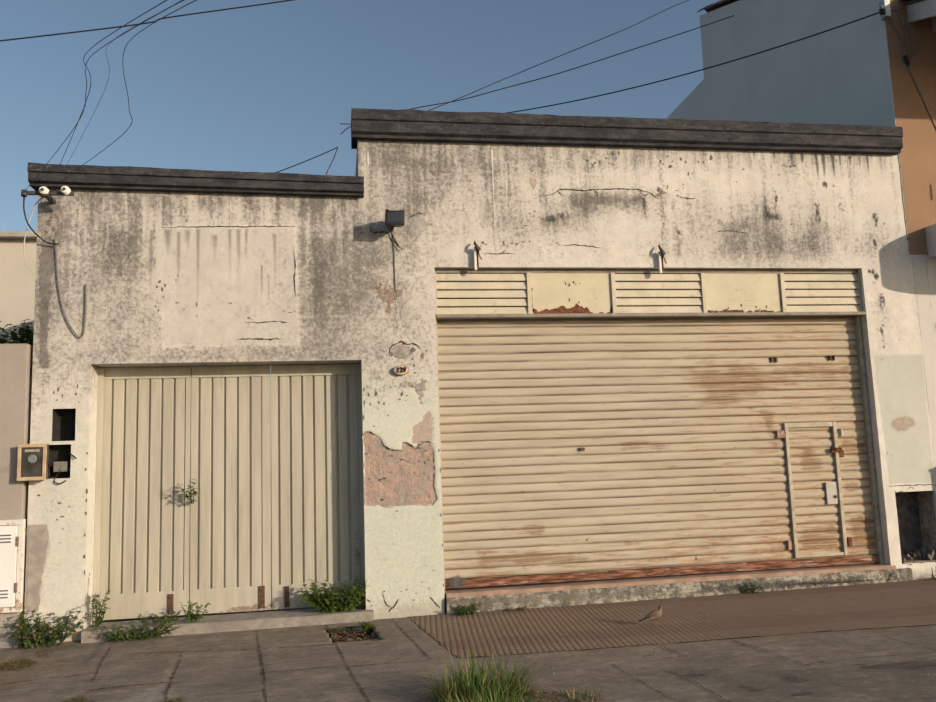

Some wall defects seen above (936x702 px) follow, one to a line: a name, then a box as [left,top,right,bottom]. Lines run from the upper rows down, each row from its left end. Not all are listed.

leakage [815,154,869,172]
crack [541,188,694,199]
leakage [39,238,54,368]
rust [531,287,613,314]
spalling [362,340,442,516]
peeling [890,412,914,432]